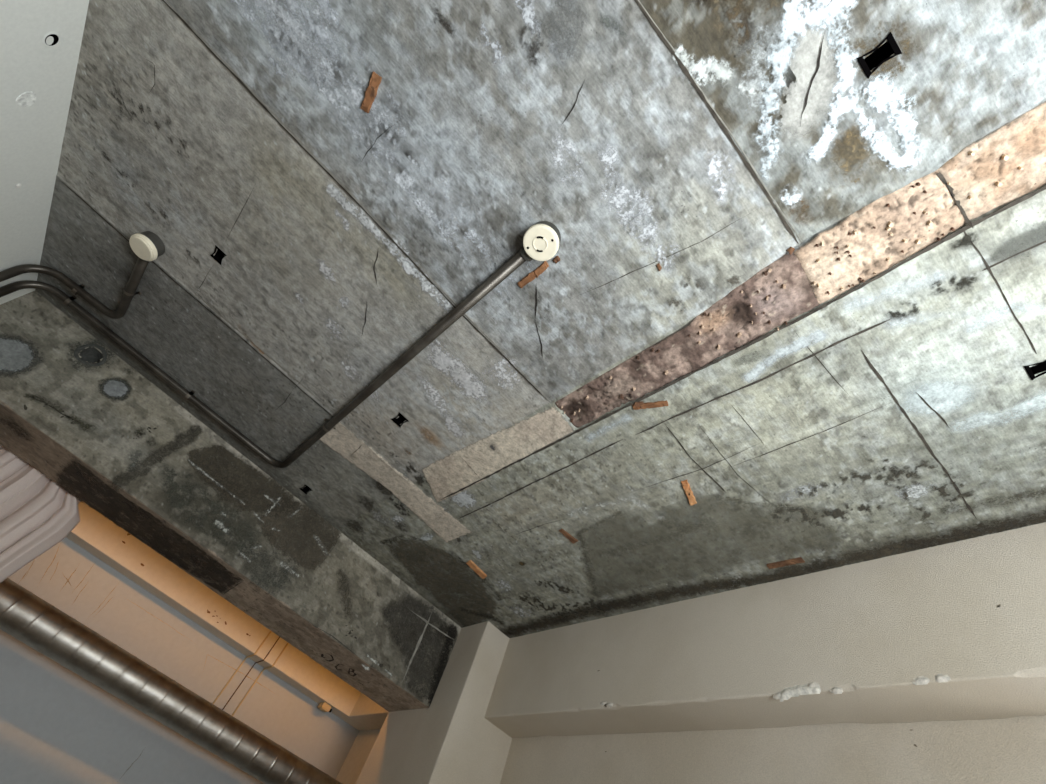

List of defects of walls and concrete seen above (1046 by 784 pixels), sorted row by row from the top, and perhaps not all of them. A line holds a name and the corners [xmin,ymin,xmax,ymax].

water stain [673,0,923,183]
crack [800,0,832,127]
efflorescence [552,135,582,182]
efflorescence [600,144,678,269]
efflorescence [707,152,732,200]
water stain [781,189,809,222]
spalling [555,103,1046,428]
water stain [0,335,43,377]
water stain [67,338,132,401]
water stain [24,394,95,432]
crack [917,393,949,427]
water stain [56,426,1046,707]